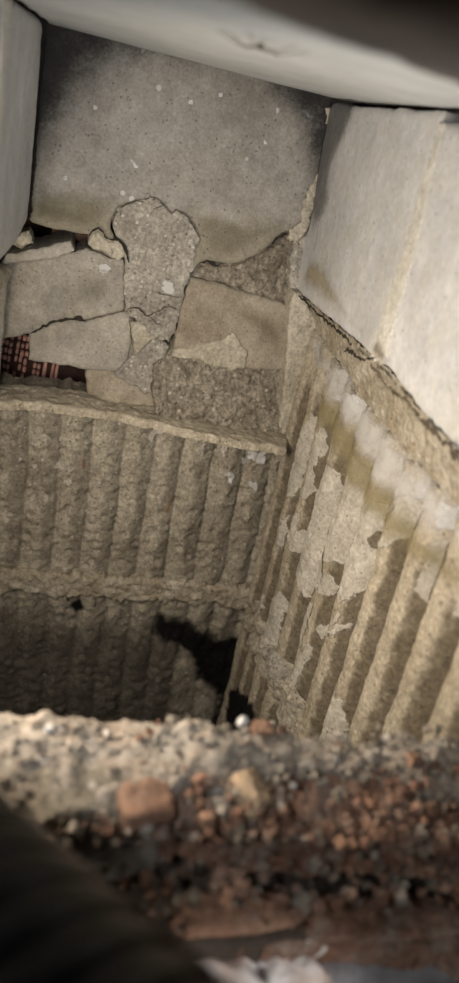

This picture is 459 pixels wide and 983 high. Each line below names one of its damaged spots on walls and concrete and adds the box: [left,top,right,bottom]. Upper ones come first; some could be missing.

crack [87,188,200,262]
crack [200,233,288,267]
crack [31,293,179,351]
crack [298,295,459,462]
peeling [276,412,424,687]
peeling [414,502,459,603]
peeling [257,591,289,647]
peeling [319,692,350,746]